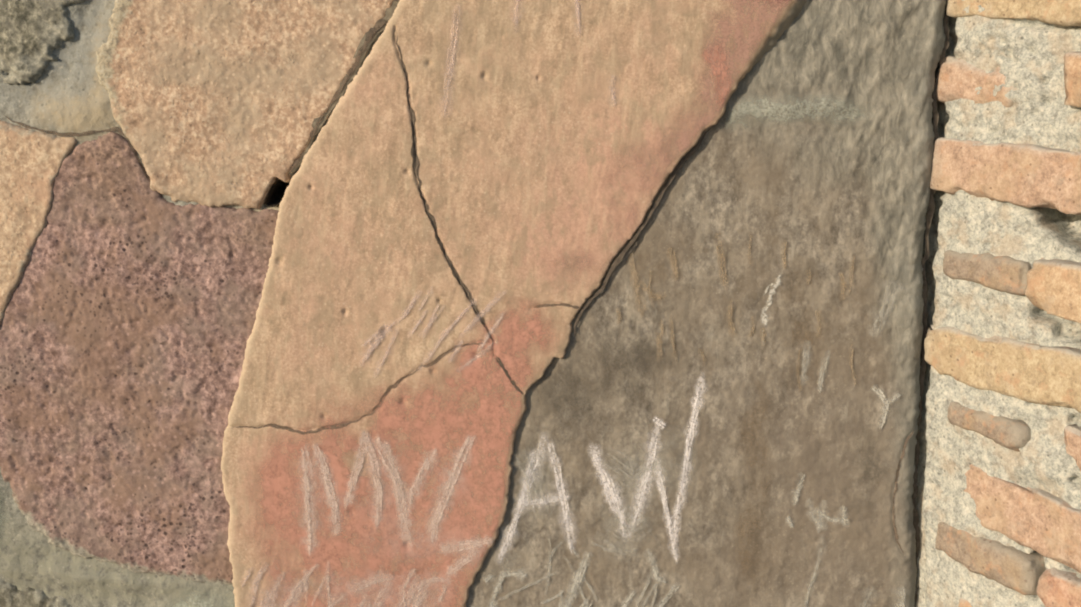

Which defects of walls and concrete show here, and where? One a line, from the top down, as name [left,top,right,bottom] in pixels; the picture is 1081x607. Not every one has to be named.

crack [233,0,523,434]